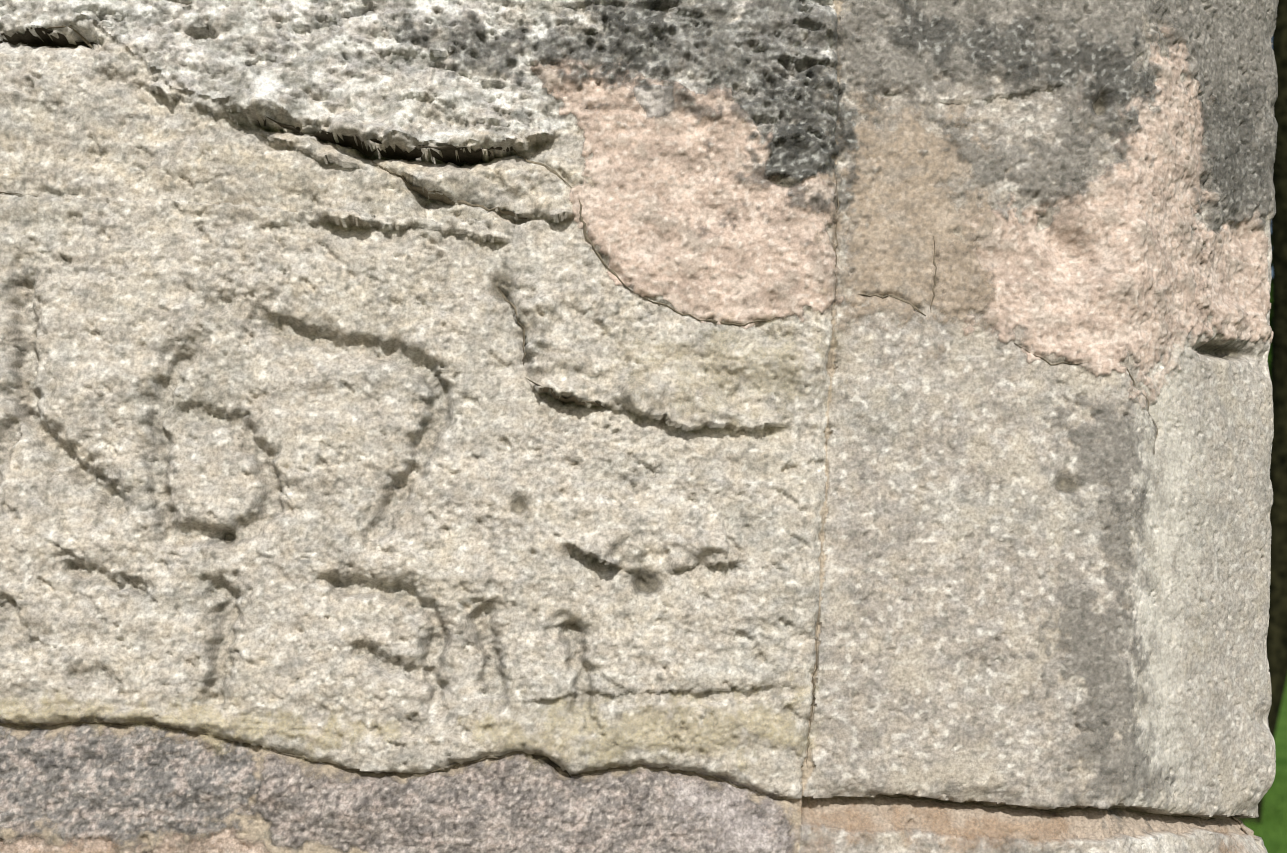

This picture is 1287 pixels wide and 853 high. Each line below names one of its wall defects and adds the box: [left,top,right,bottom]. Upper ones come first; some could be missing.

crack [0,25,97,49]
flaking render [530,27,1274,409]
spalling [0,713,807,853]